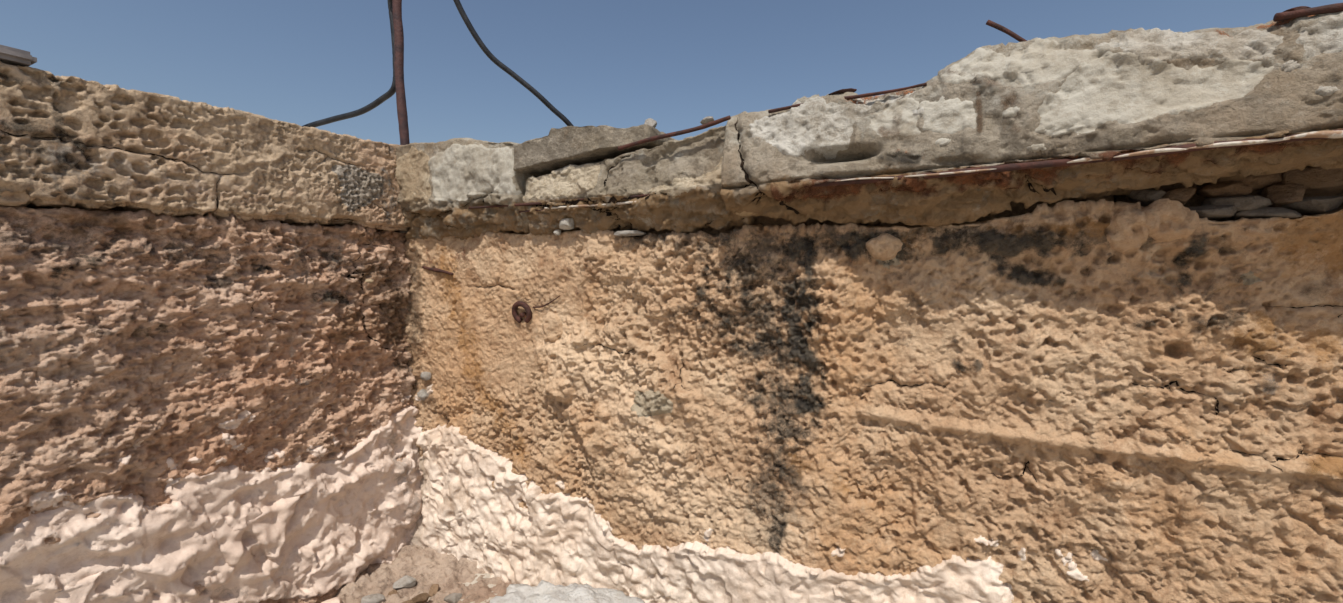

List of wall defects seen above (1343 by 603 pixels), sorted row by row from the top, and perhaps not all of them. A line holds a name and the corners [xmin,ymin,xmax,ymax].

spalling [749,3,1343,188]
crack [0,130,231,212]
spalling [618,115,731,151]
crack [705,117,803,226]
corrosion [771,152,1083,202]
corrosion [1099,149,1190,178]
corrosion [1234,134,1330,155]
leakage [674,225,1088,552]
crack [1230,440,1340,472]